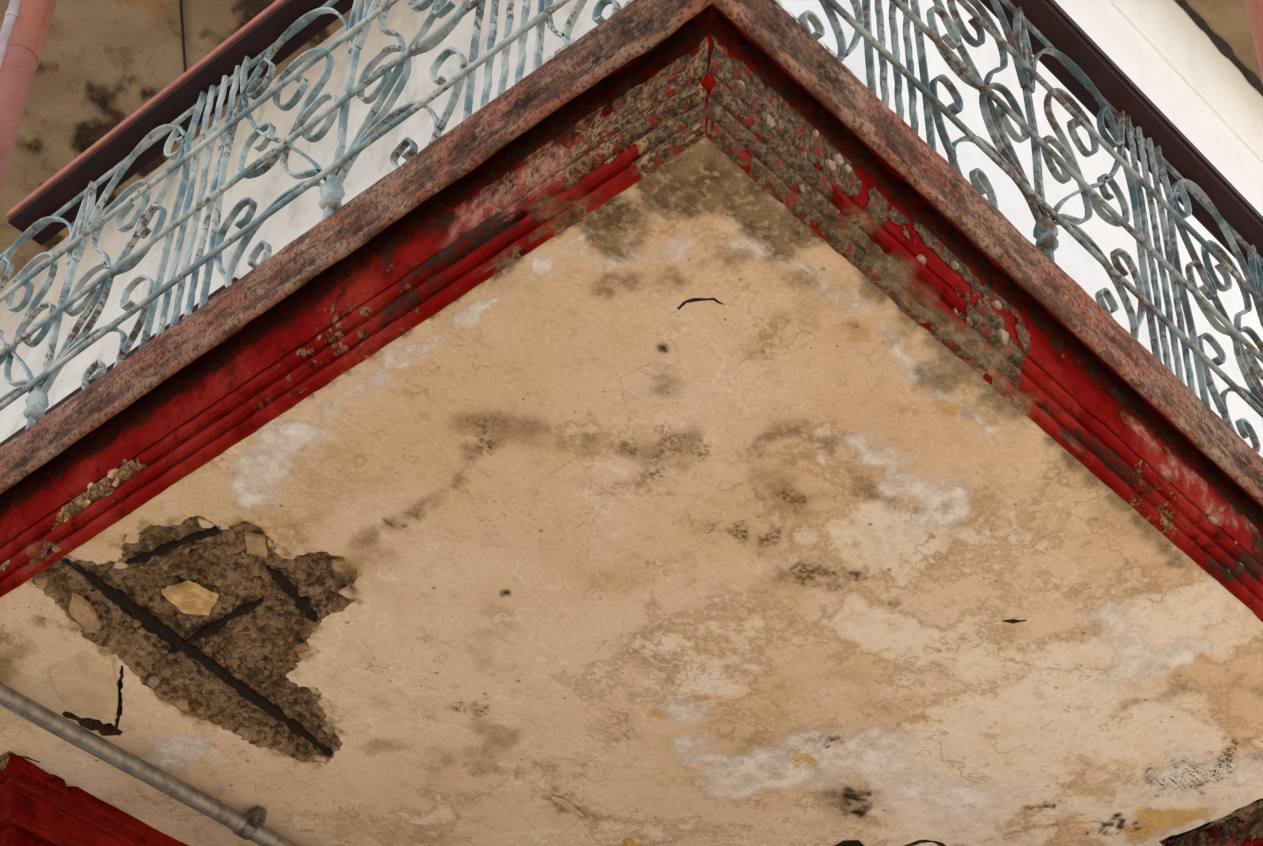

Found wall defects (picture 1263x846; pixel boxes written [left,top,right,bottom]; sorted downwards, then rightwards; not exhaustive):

mould [72,85,123,152]
mould [137,155,165,176]
mould [43,236,64,251]
leakage [484,248,552,280]
peeling [485,34,1031,395]
leakage [530,140,1031,417]
leakage [232,330,444,509]
leakage [846,435,971,530]
spalling [27,458,357,766]
leakage [660,701,1026,831]
crack [904,838,964,846]
spalling [1122,798,1263,846]